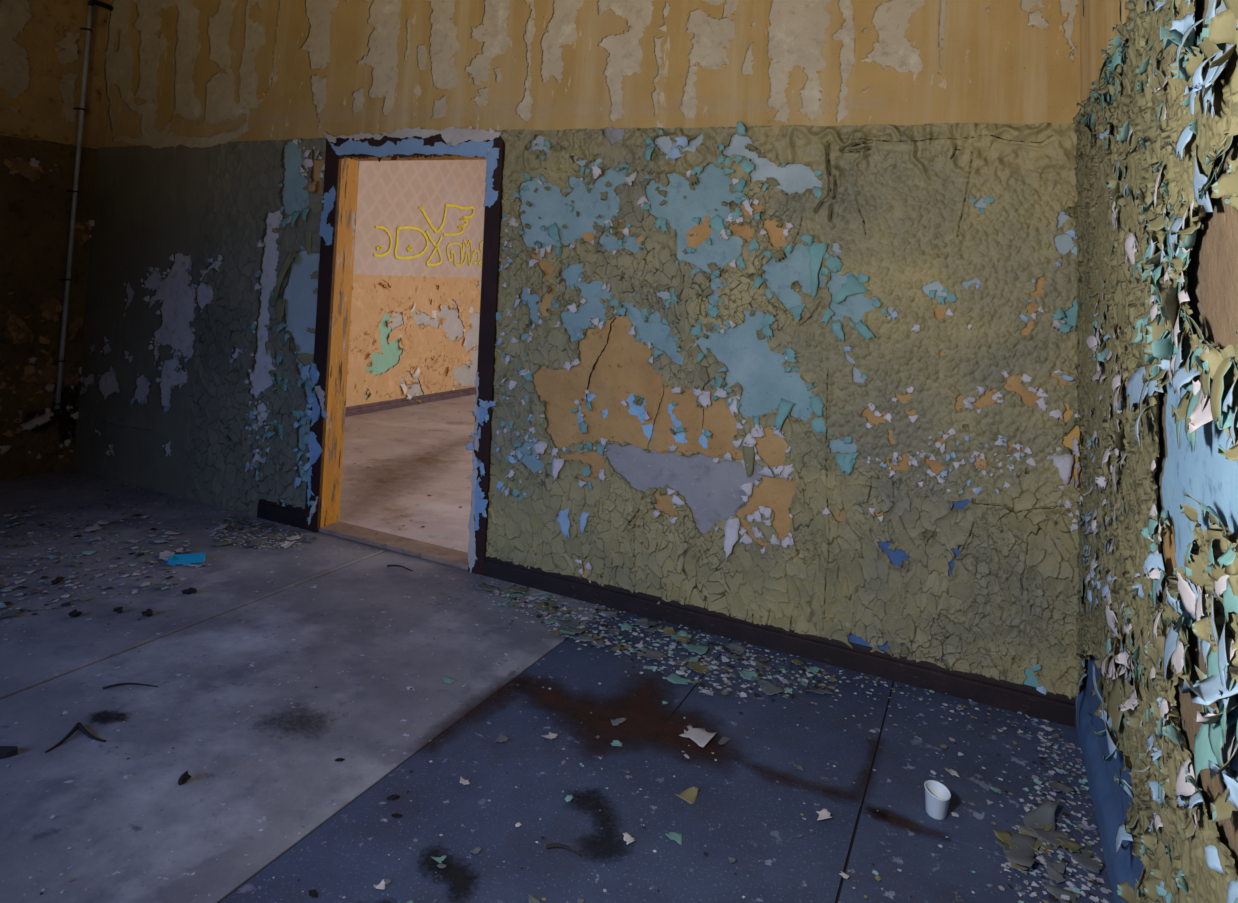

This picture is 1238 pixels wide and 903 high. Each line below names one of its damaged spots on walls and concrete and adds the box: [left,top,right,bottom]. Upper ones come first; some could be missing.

peeling [0,0,32,99]
peeling [104,0,282,149]
crack [795,135,1053,239]
peeling [229,0,511,525]
crack [586,315,622,402]
peeling [366,0,1238,903]
crack [963,504,1065,550]